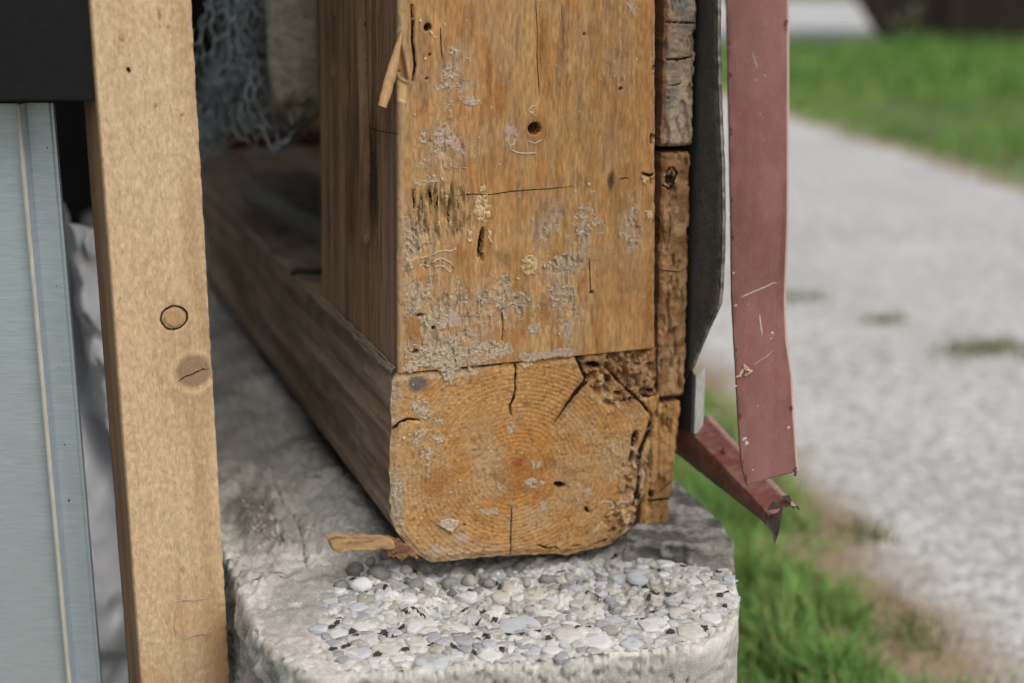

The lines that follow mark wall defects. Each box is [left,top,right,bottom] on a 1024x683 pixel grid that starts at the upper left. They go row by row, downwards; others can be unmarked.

crack [412,186,573,212]
crack [509,362,517,411]
crack [553,355,672,507]
crack [507,508,515,554]